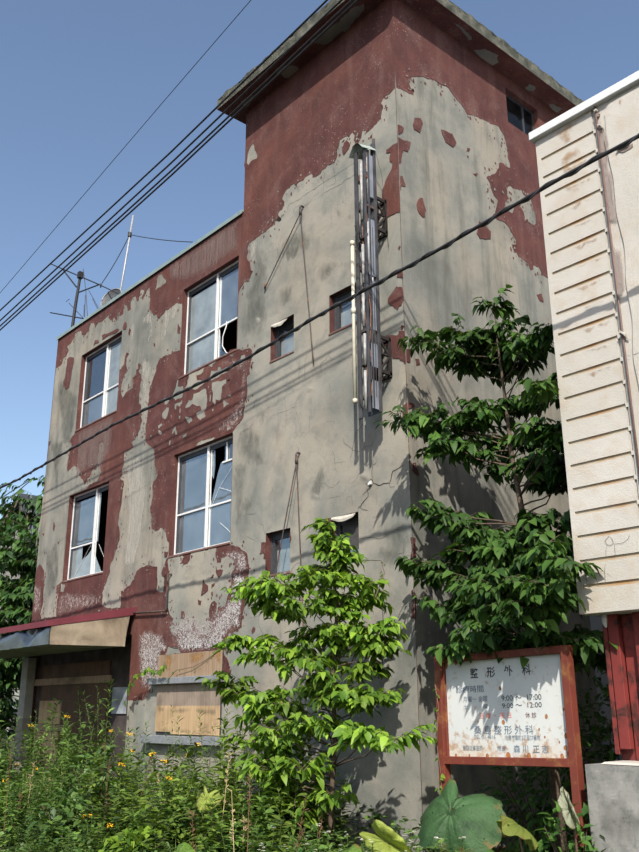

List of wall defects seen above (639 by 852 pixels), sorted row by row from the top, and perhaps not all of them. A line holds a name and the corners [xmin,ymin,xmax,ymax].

peeling [36,68,572,852]
crack [322,427,403,515]
leakage [139,632,165,688]
leakage [171,551,247,650]
peeling [559,592,591,634]
peeling [575,662,604,805]